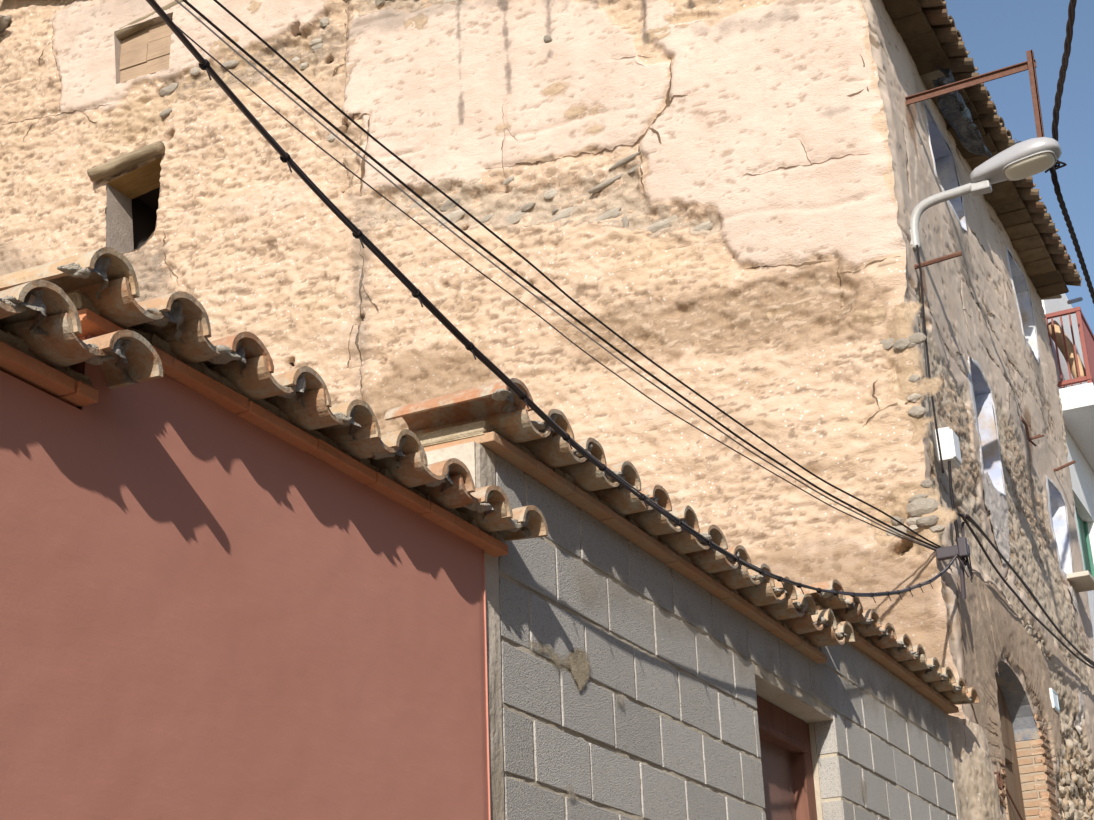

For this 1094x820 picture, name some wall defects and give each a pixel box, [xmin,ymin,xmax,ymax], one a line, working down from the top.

crack [485,55,686,196]
crack [745,138,869,176]
crack [347,246,379,400]